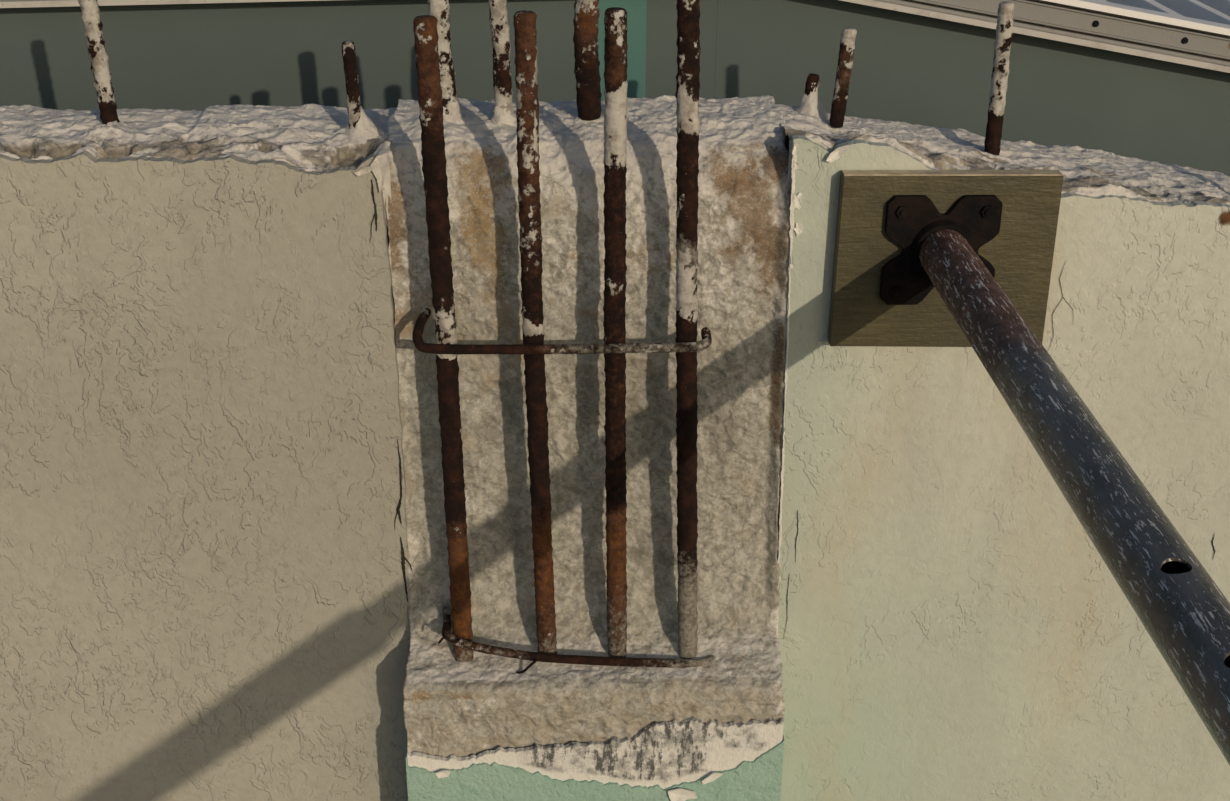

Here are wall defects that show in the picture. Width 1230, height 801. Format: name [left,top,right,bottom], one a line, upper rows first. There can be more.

spalling [775,1,1230,205]
corrosion [455,149,510,290]
corrosion [712,145,788,294]
spalling [0,0,804,789]
crack [394,439,413,602]
peeling [668,788,697,801]